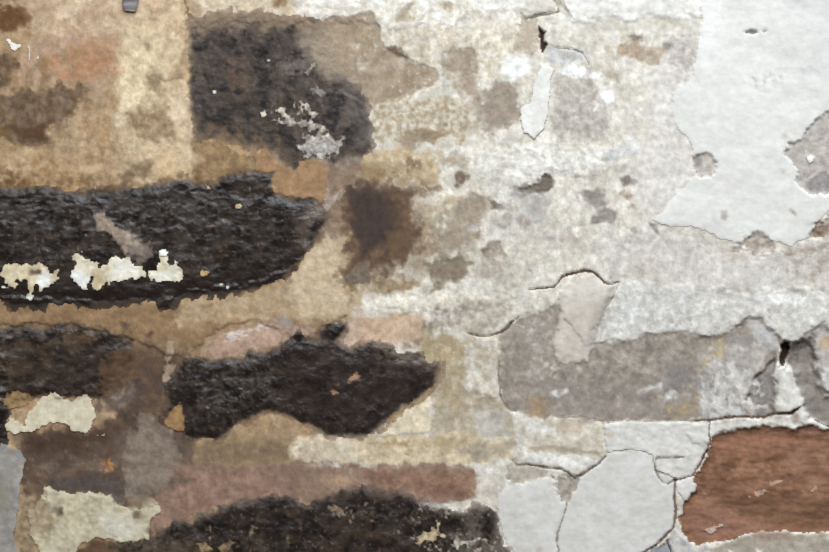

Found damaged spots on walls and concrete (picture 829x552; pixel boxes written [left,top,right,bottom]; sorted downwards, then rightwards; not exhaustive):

damp [267,55,318,76]
damp [260,84,347,160]
spalling [784,112,829,195]
peeling [0,262,59,301]
peeling [70,249,184,291]
crack [528,269,620,331]
flaking render [497,303,829,546]
crack [505,455,607,552]
crack [544,406,829,552]